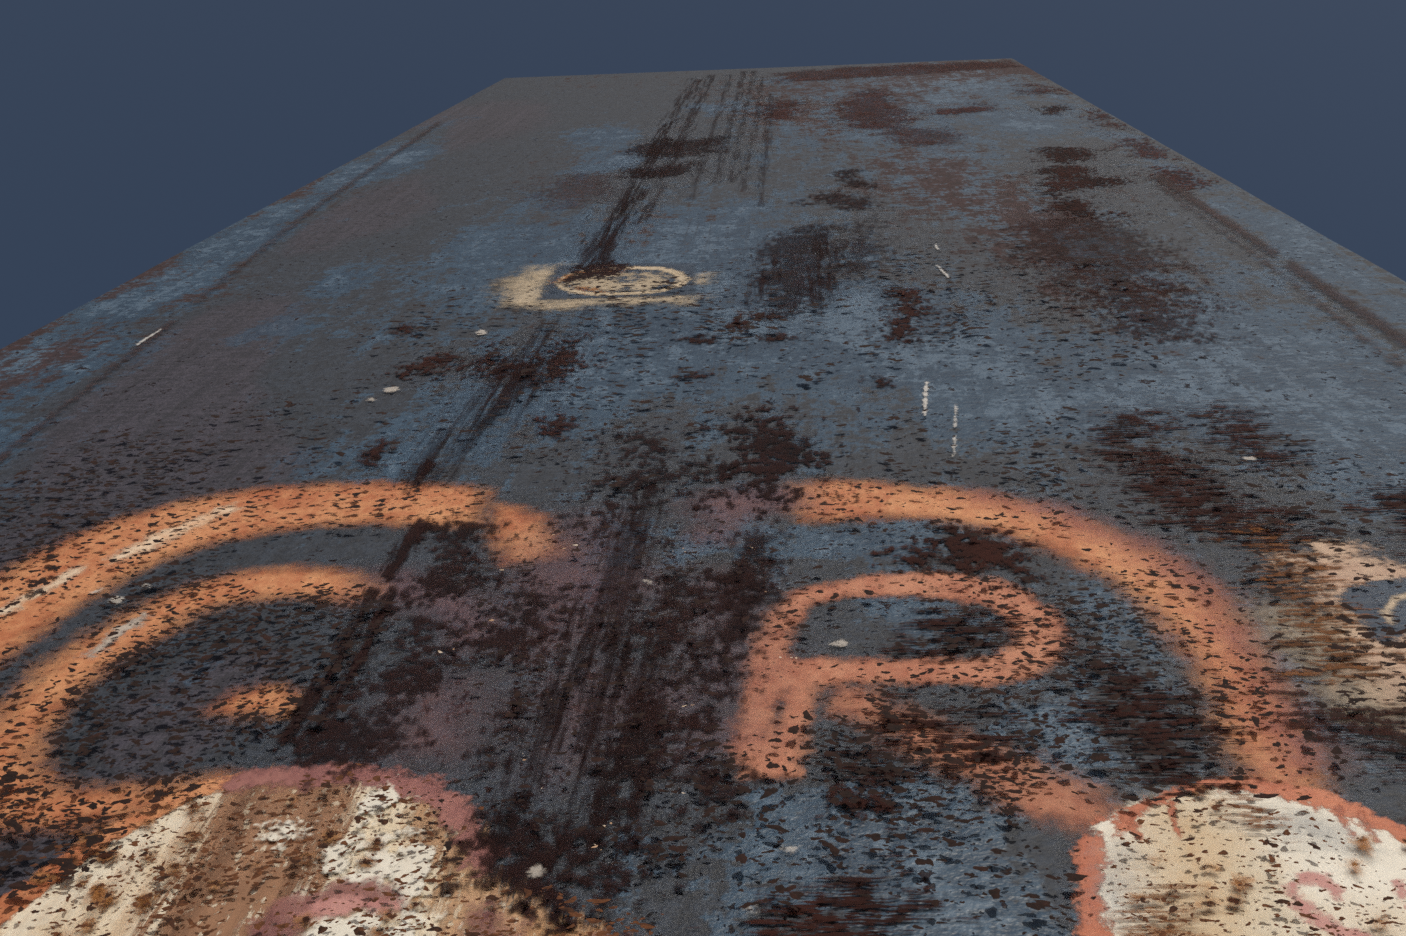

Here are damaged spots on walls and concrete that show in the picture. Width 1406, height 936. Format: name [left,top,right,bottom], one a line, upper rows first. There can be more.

rust [380,332,608,390]
rust [556,259,634,293]
rust [1017,83,1406,357]
peeling [0,236,1406,936]
rust [1051,399,1406,782]
rust [743,855,978,936]